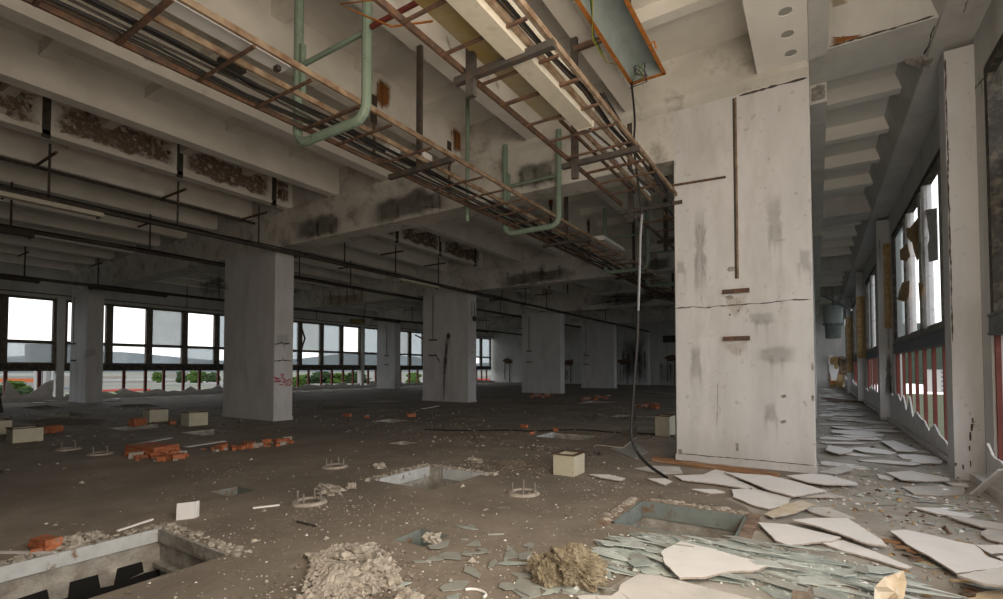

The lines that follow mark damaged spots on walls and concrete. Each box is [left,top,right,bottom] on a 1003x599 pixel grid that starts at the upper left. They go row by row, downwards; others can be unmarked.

peeling [0,82,36,122]
peeling [60,106,171,164]
peeling [189,153,288,202]
crack [830,15,953,341]
crack [676,292,811,309]